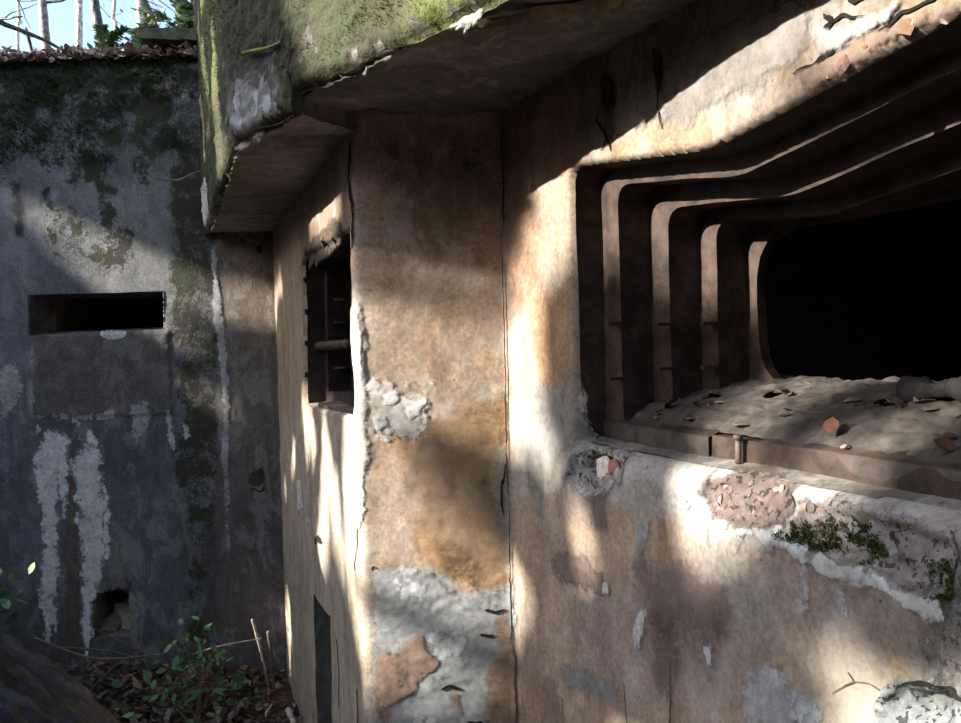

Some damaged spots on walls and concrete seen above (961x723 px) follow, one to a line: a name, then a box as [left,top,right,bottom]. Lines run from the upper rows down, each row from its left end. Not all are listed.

flaking render [652,0,926,130]
crack [793,0,933,74]
water stain [11,182,24,236]
water stain [0,357,142,672]
flaking render [348,302,433,570]
spalling [562,444,636,501]
spalling [696,469,961,593]
spalling [367,564,516,723]
spalling [871,674,961,723]